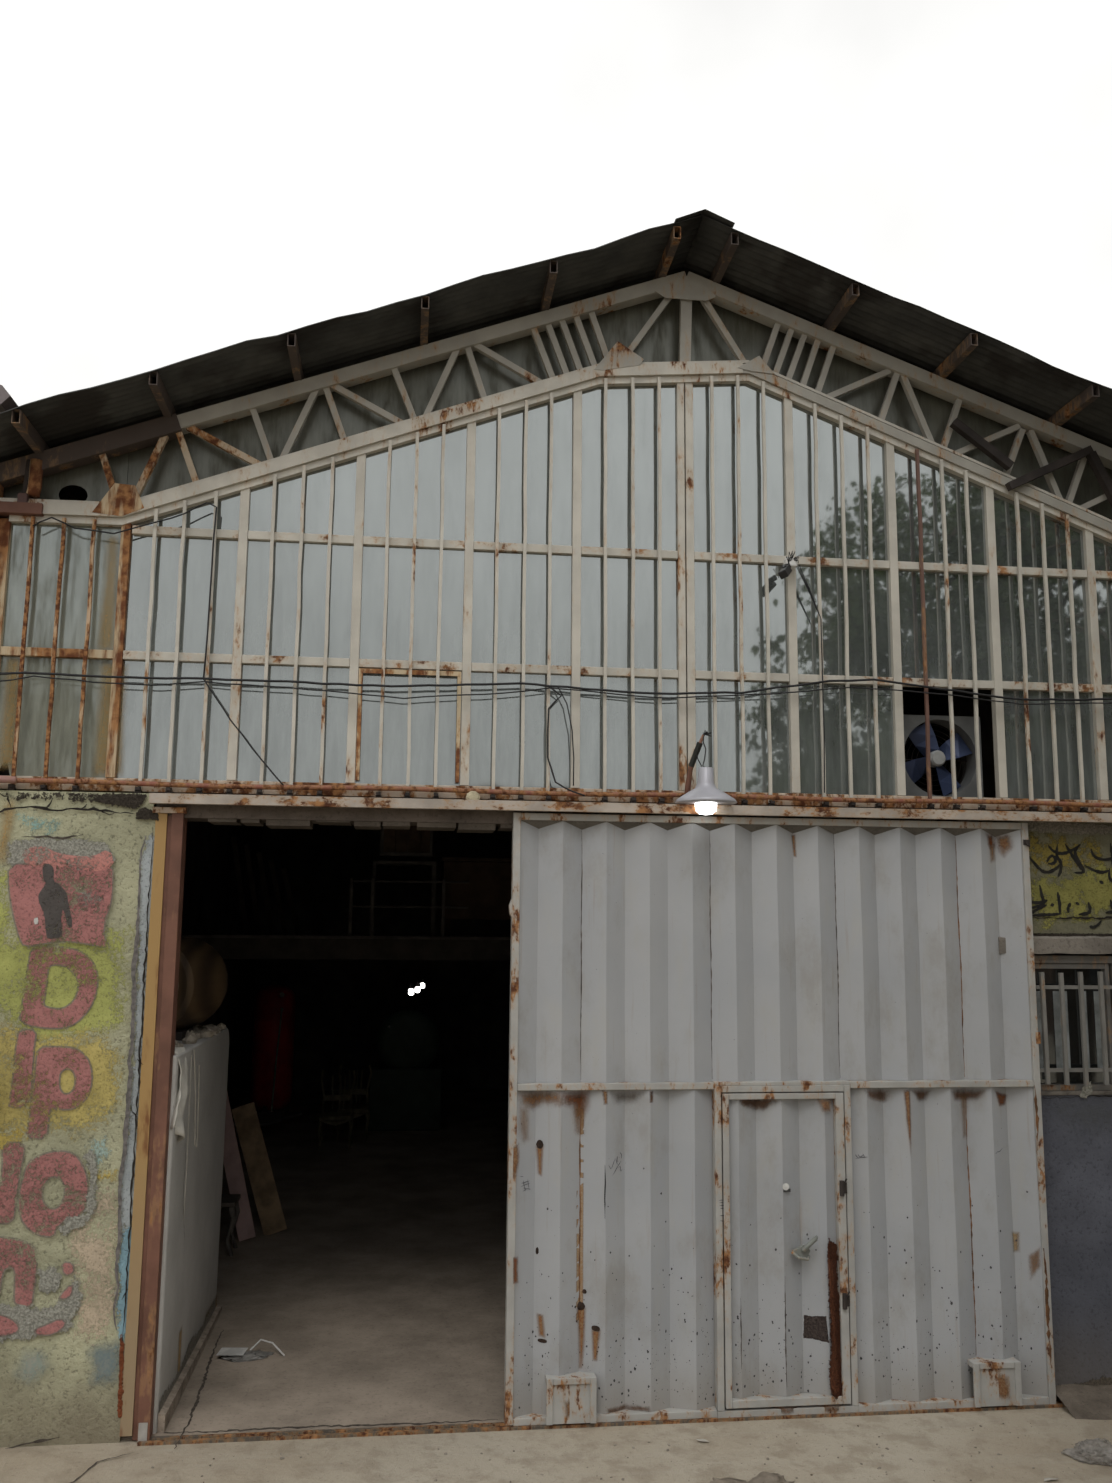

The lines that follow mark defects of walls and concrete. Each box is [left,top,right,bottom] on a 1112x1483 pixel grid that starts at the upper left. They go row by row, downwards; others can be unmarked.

spalling [2,791,159,821]
peeling [5,834,116,908]
corrosion [524,1091,653,1321]
corrosion [767,1238,842,1413]
corrosion [998,1377,1009,1397]